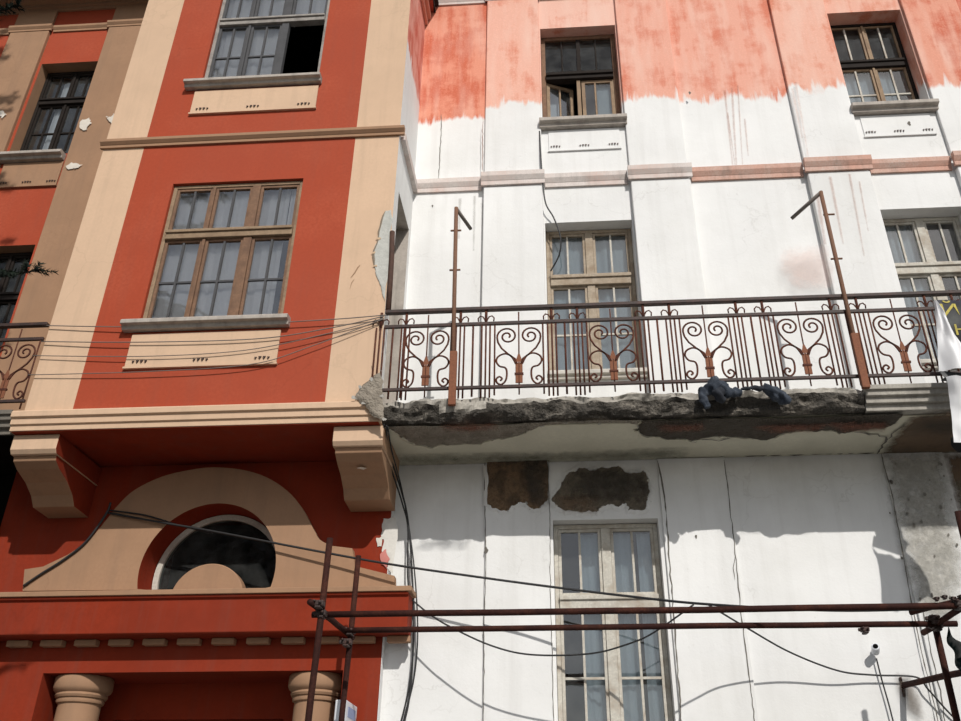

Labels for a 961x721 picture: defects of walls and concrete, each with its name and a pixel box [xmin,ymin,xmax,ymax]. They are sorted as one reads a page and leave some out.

flaking render [372,210,393,299]
spalling [351,370,903,449]
flaking render [483,461,655,518]